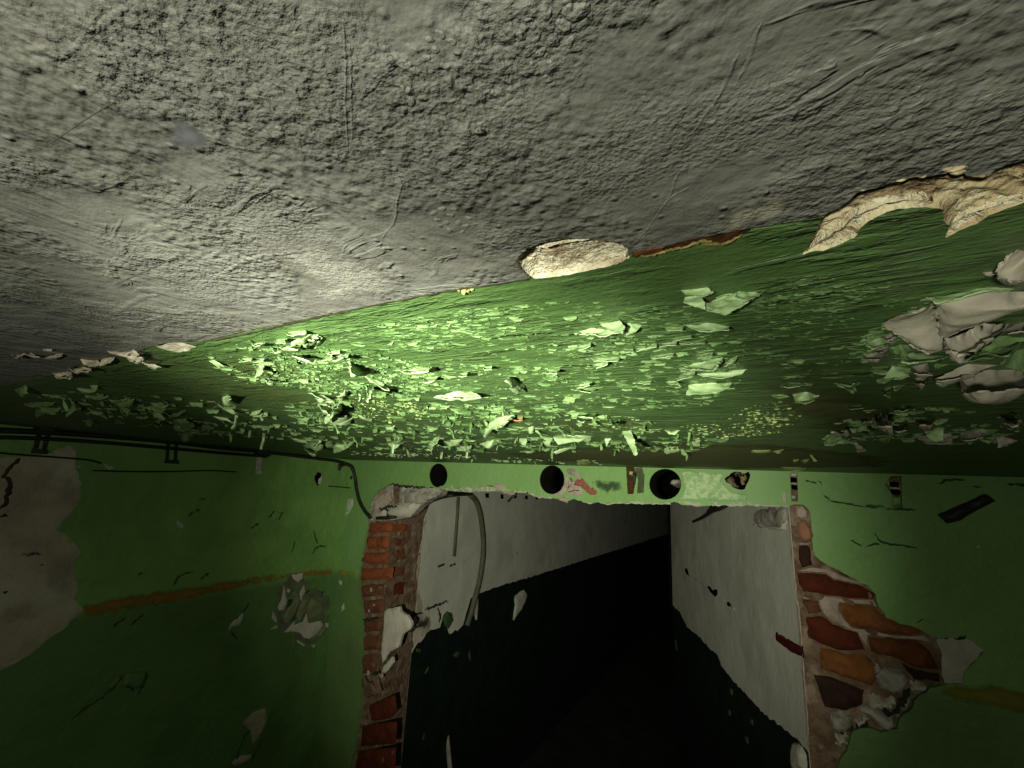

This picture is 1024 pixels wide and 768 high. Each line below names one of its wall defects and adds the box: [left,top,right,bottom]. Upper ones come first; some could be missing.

spalling [517,238,630,278]
corrosion [632,228,750,258]
spalling [803,160,1024,255]
flaking render [12,249,1024,768]
peeling [0,445,84,670]